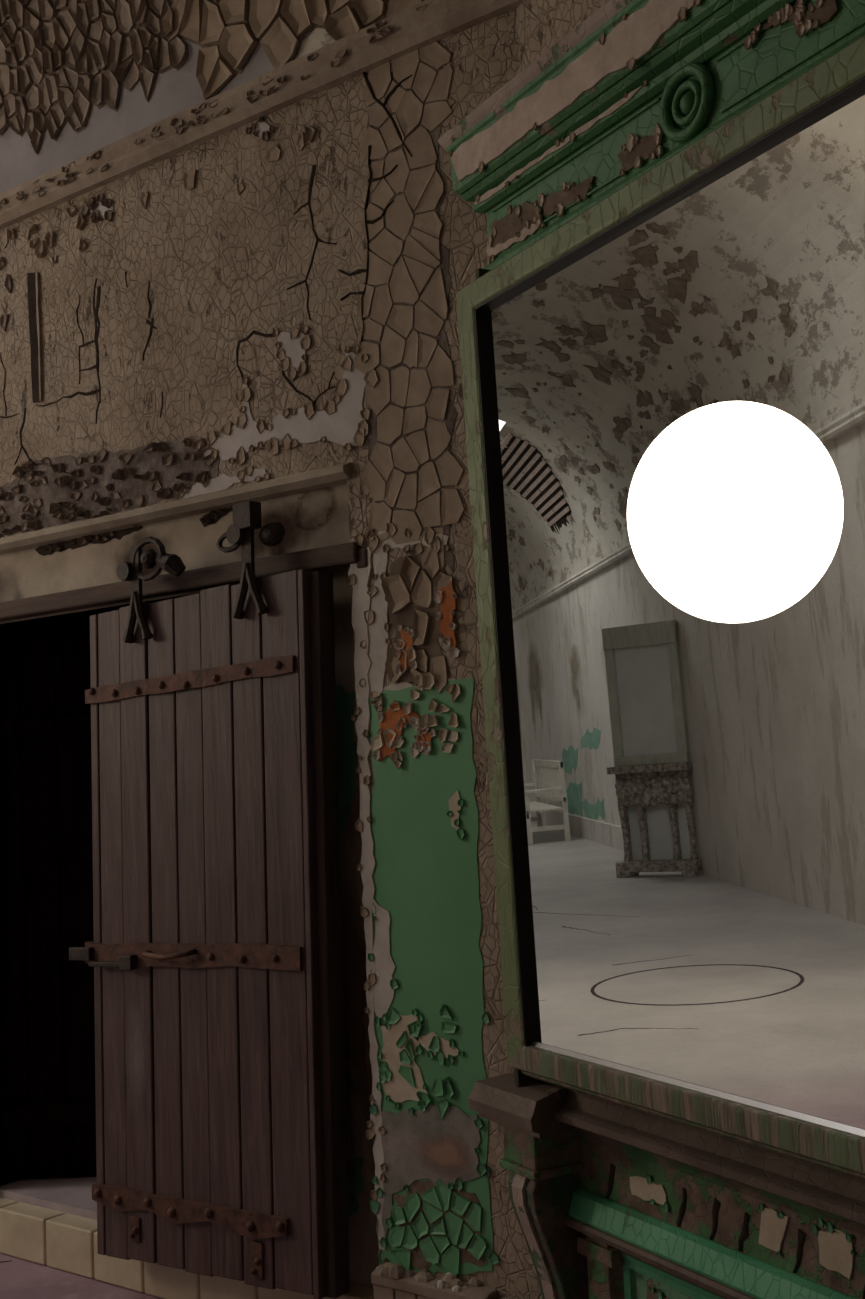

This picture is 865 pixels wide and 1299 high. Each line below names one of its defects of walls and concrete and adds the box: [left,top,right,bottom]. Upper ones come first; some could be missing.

peeling [0,0,443,205]
peeling [0,224,58,293]
crack [0,272,156,485]
peeling [0,344,379,556]
crack [236,330,275,385]
crack [282,42,465,693]
peeling [348,522,491,1292]